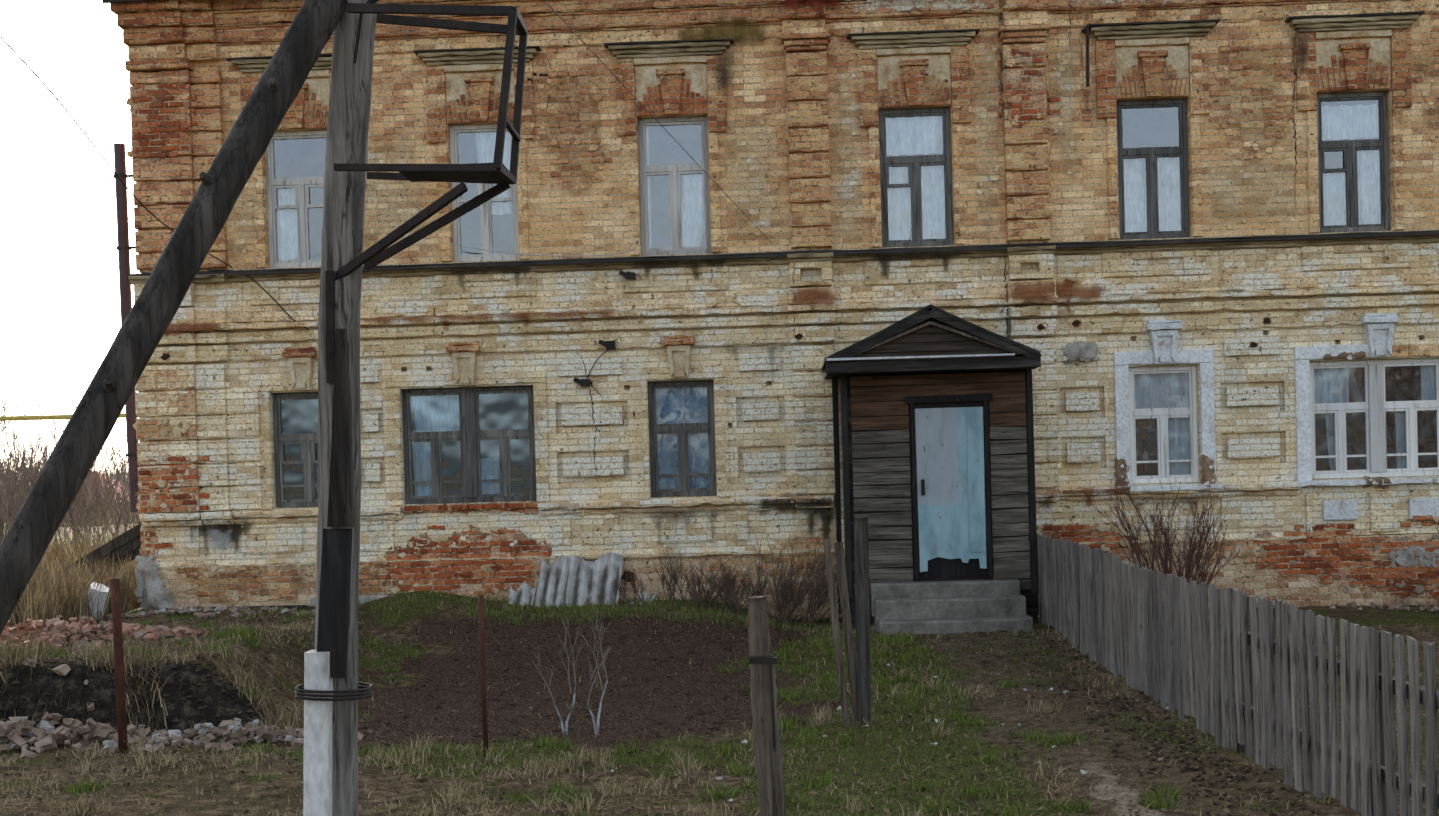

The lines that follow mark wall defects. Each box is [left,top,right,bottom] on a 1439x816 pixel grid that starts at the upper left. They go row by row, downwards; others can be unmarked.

spalling [126,77,198,161]
spalling [133,416,191,443]
spalling [136,455,210,560]
spalling [176,562,308,606]
spalling [359,500,552,597]
spalling [1189,515,1439,605]